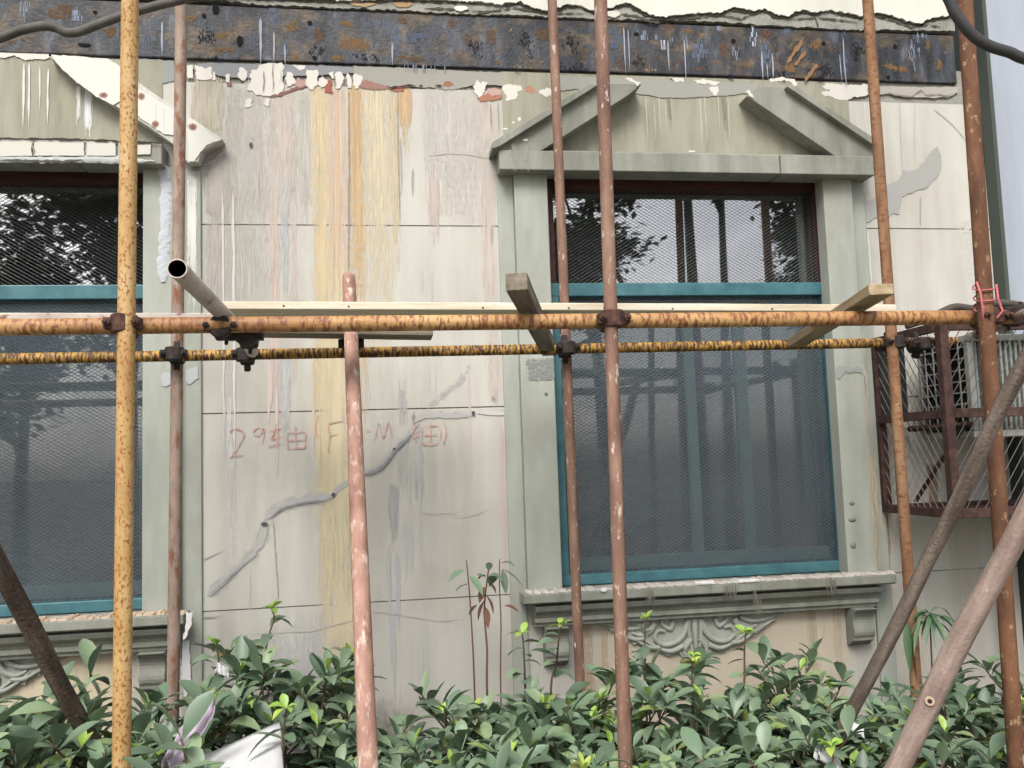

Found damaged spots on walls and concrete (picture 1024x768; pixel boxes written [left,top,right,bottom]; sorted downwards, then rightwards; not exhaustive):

rust [785,38,837,81]
spalling [187,62,597,108]
spalling [610,77,797,98]
spalling [820,83,958,100]
crack [365,412,415,475]
crack [271,497,332,601]